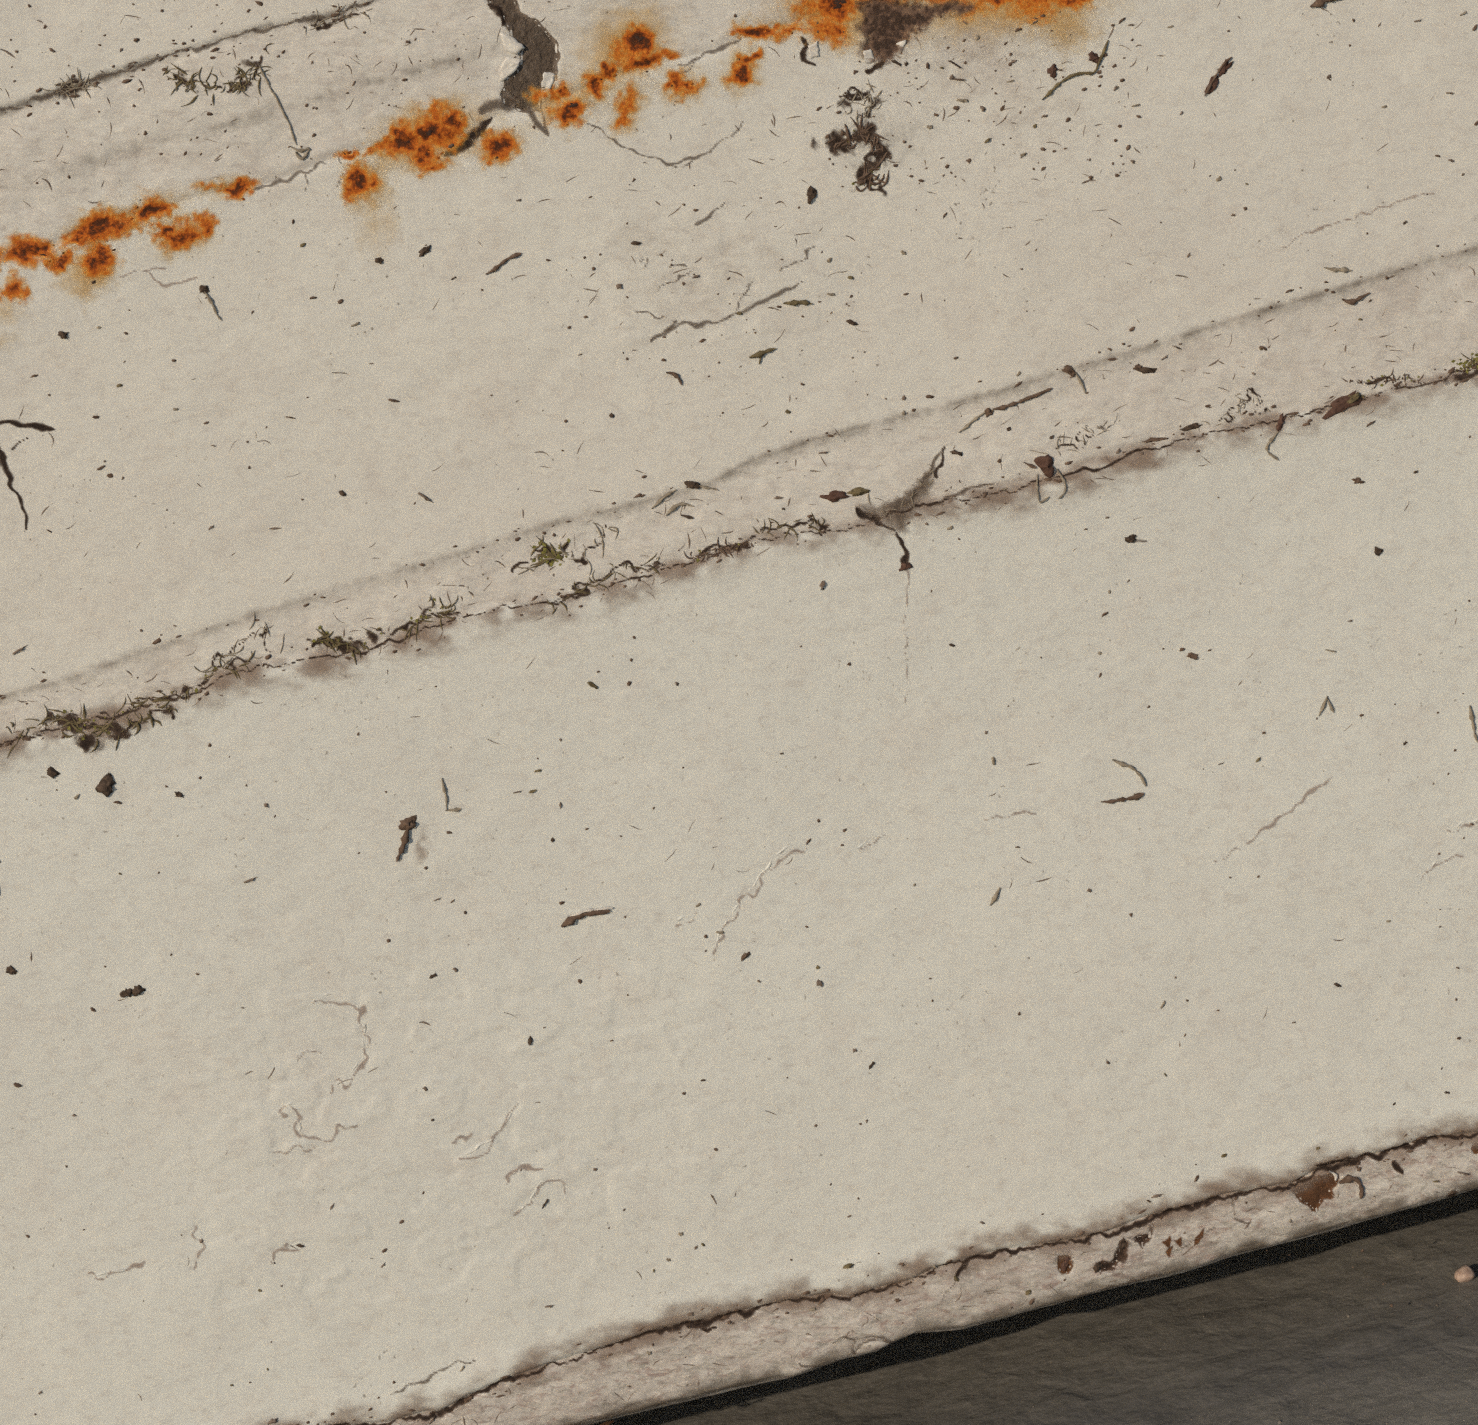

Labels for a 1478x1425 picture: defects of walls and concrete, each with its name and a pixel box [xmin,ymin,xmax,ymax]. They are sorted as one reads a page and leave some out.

spalling [443,0,560,157]
corrosion [525,11,705,129]
corrosion [724,0,869,87]
corrosion [887,0,1092,39]
corrosion [195,176,257,201]
corrosion [336,99,521,203]
corrosion [0,195,220,301]
crack [0,364,1478,745]
peeling [1290,1171,1364,1212]
peeling [1057,1255,1073,1274]
peeling [1093,1226,1215,1273]